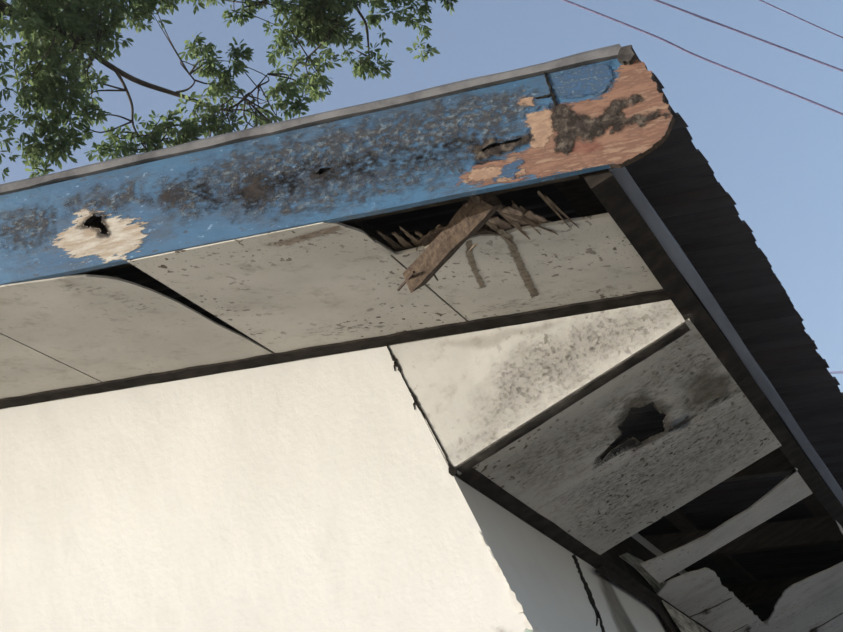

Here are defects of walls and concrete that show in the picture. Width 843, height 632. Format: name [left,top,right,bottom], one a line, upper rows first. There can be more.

peeling [162,59,673,221]
peeling [0,181,151,263]
crack [387,346,457,476]
damp [595,364,740,468]
crack [572,555,605,632]